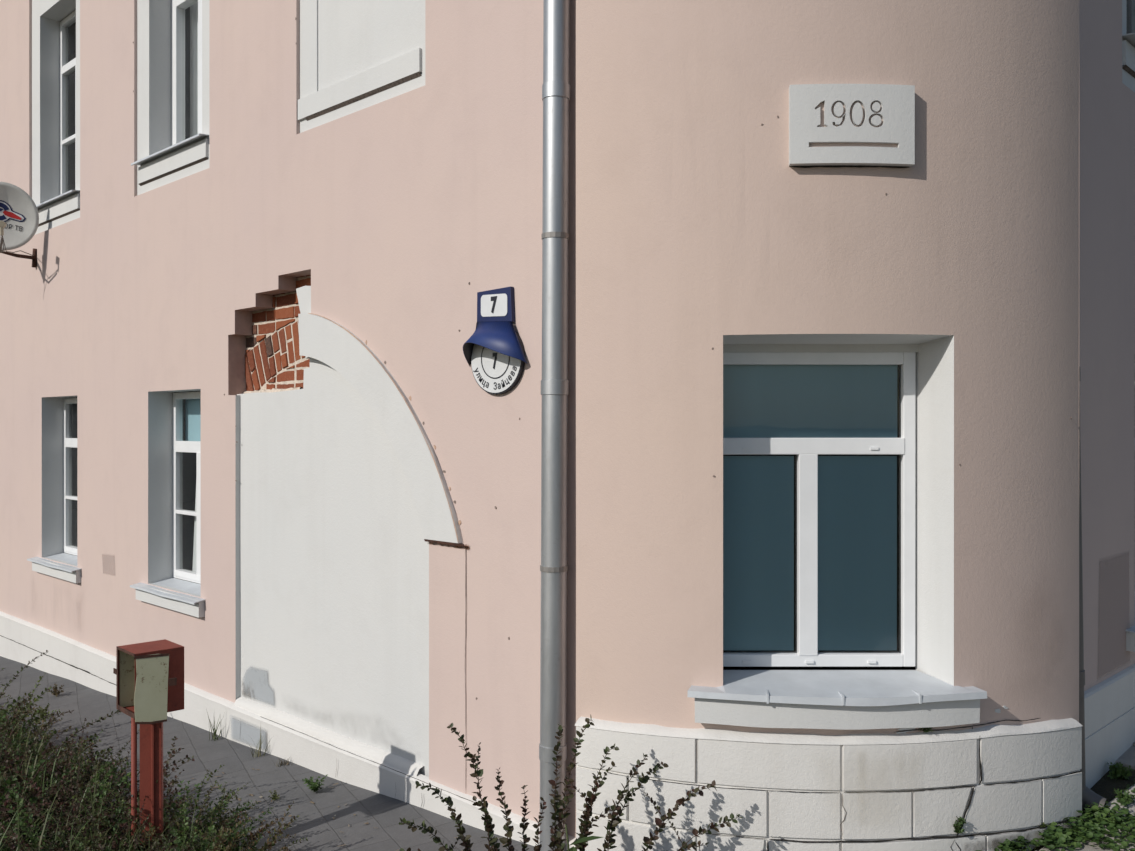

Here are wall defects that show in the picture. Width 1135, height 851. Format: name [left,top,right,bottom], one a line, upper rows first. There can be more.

flaking render [243,275,469,547]
crack [610,718,1082,851]